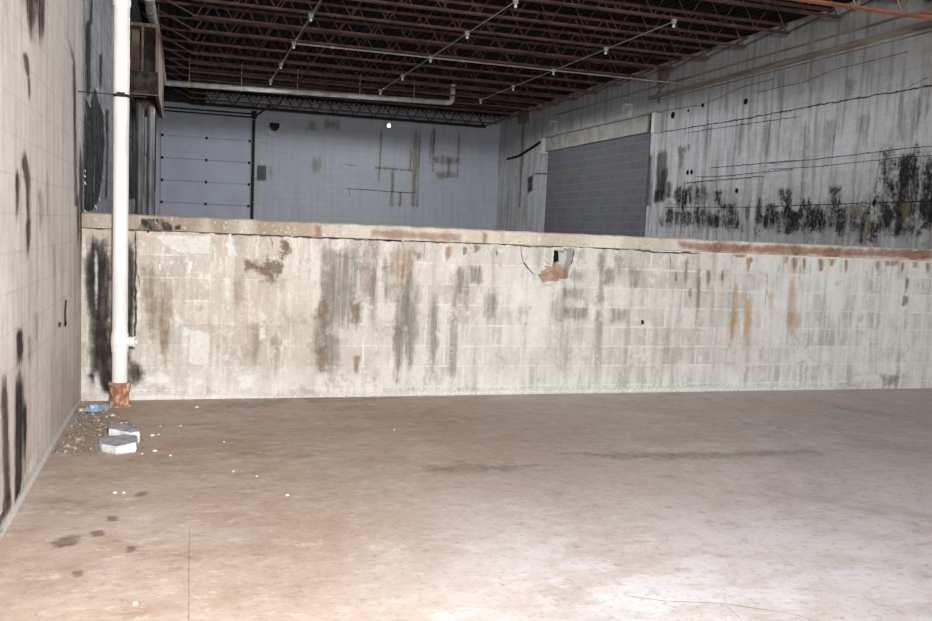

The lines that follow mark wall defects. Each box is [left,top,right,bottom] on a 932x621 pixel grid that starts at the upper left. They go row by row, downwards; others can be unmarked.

leakage [26,0,45,37]
leakage [660,151,932,243]
spalling [532,247,581,287]
rust [681,243,932,271]
leakage [315,251,359,370]
leakage [396,281,417,358]
leakage [129,363,897,407]
leakage [0,374,111,542]